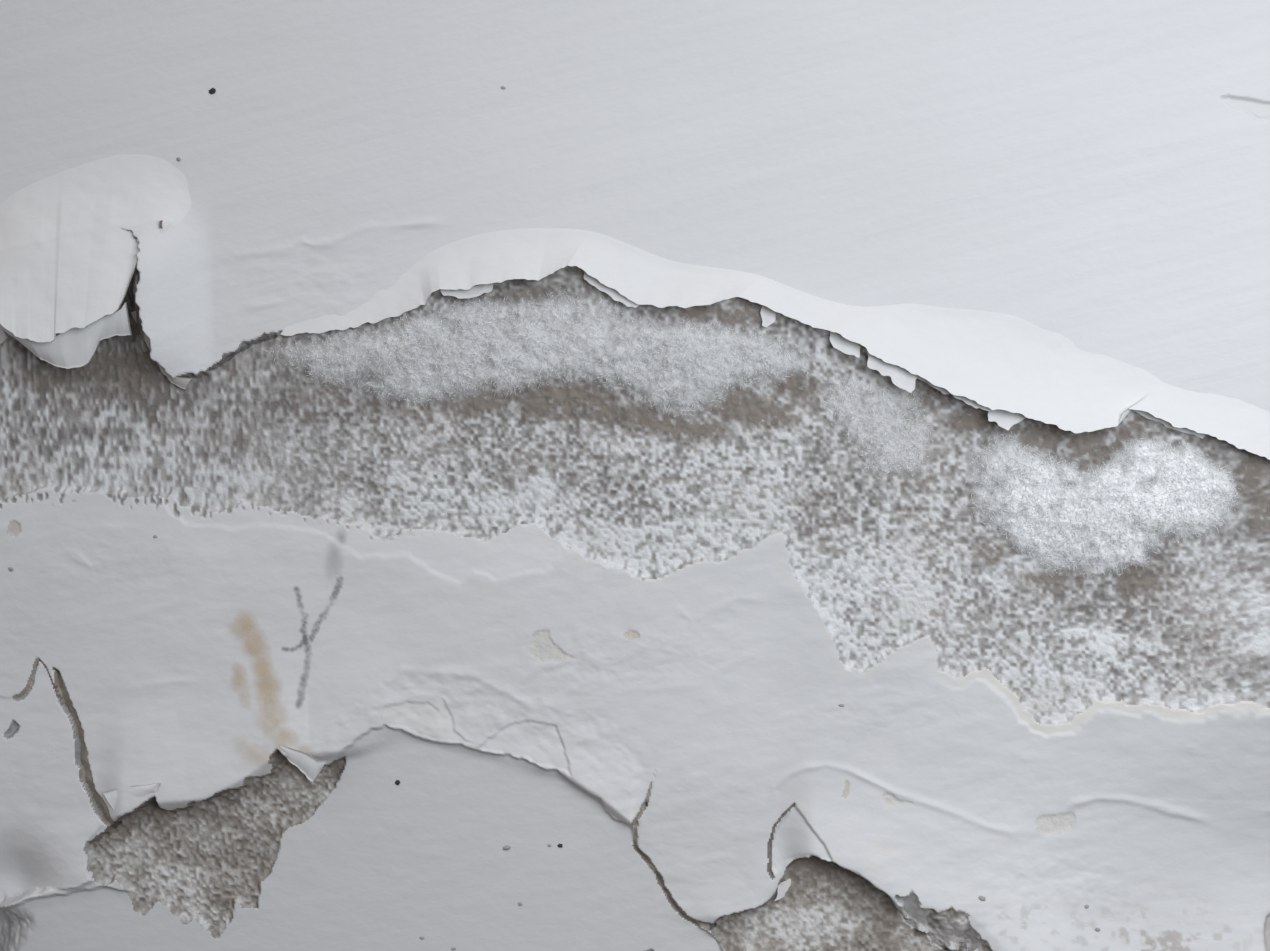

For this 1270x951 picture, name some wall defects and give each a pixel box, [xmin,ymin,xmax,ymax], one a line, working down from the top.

spalling [0,229,1270,726]
damp [952,408,1270,593]
crack [12,658,114,827]
peeling [0,661,655,938]
crack [631,787,711,931]
spalling [709,856,992,951]